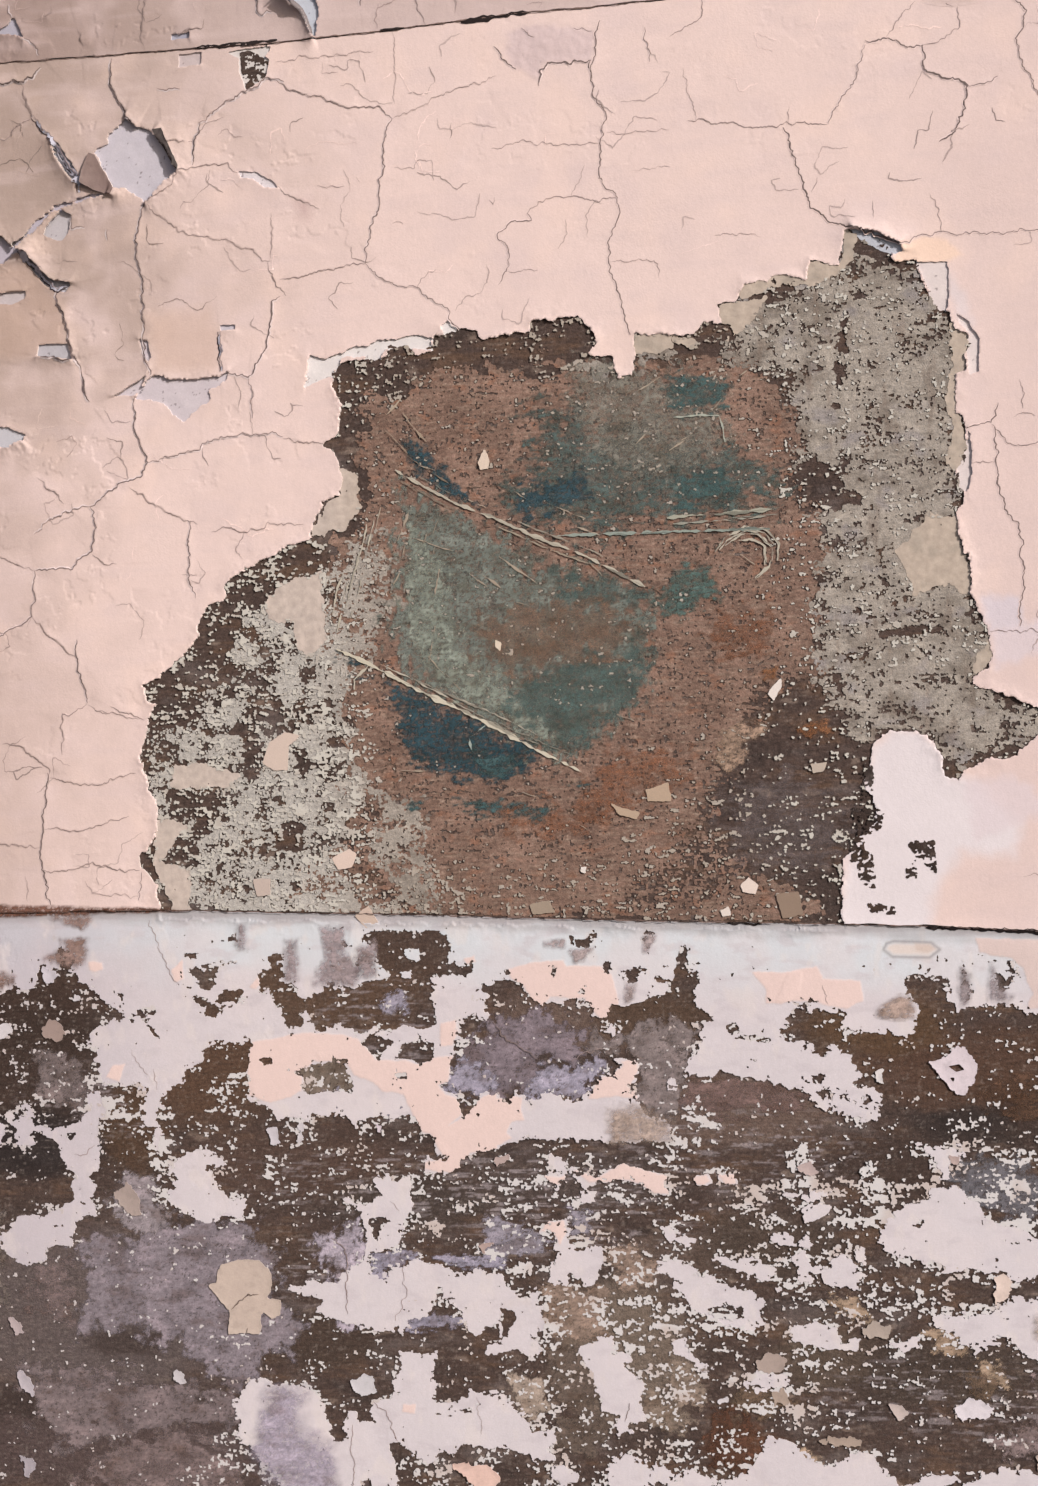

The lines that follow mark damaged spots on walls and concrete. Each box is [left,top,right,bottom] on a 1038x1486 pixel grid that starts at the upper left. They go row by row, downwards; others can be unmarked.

peeling [0,18,23,37]
peeling [288,0,319,39]
peeling [0,291,26,305]
peeling [38,344,72,359]
peeling [116,340,229,422]
peeling [0,427,26,448]
crack [0,0,1038,984]
peeling [140,229,1038,1090]
peeling [0,944,1038,1486]